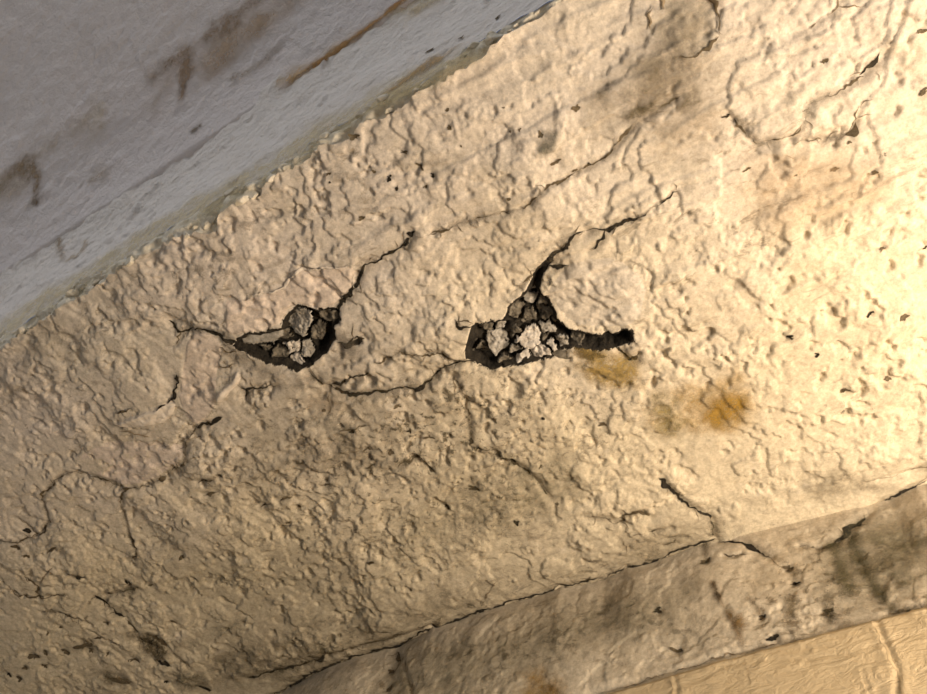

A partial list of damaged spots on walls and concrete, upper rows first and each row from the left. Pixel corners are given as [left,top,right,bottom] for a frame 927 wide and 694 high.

spalling [0,0,564,349]
rust [286,0,406,83]
crack [337,94,680,349]
leakage [629,106,652,118]
crack [734,55,880,159]
spalling [463,257,636,371]
crack [1,417,224,560]
spalling [81,304,341,485]
crack [309,349,550,495]
rust [652,380,747,435]
crack [249,478,781,694]
leakage [825,525,910,611]